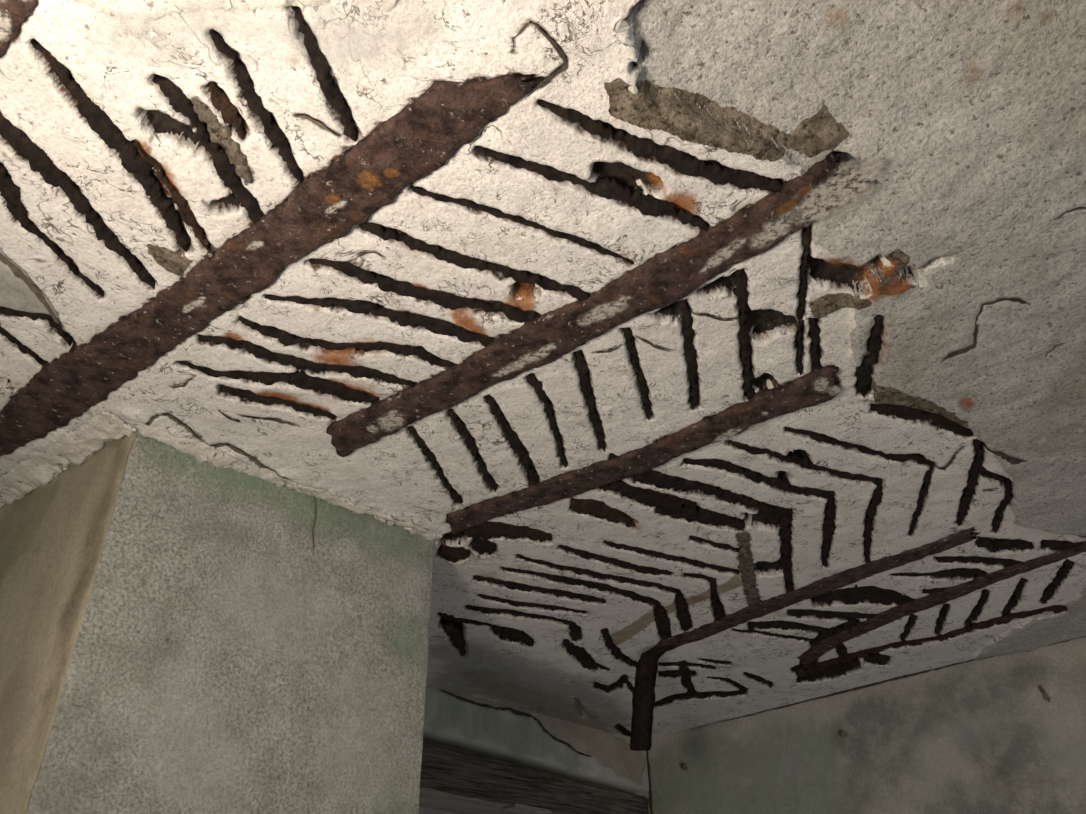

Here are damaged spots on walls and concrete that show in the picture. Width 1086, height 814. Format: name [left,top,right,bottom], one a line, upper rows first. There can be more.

spalling [146,110,199,147]
spalling [590,159,659,195]
rust [667,194,694,213]
peeling [146,244,192,276]
flaking render [604,0,1086,538]
rust [860,255,907,299]
peeling [0,249,79,353]
rust [507,282,534,311]
rust [452,309,484,335]
crack [941,298,1030,362]
rust [315,350,350,366]
crack [439,689,592,757]